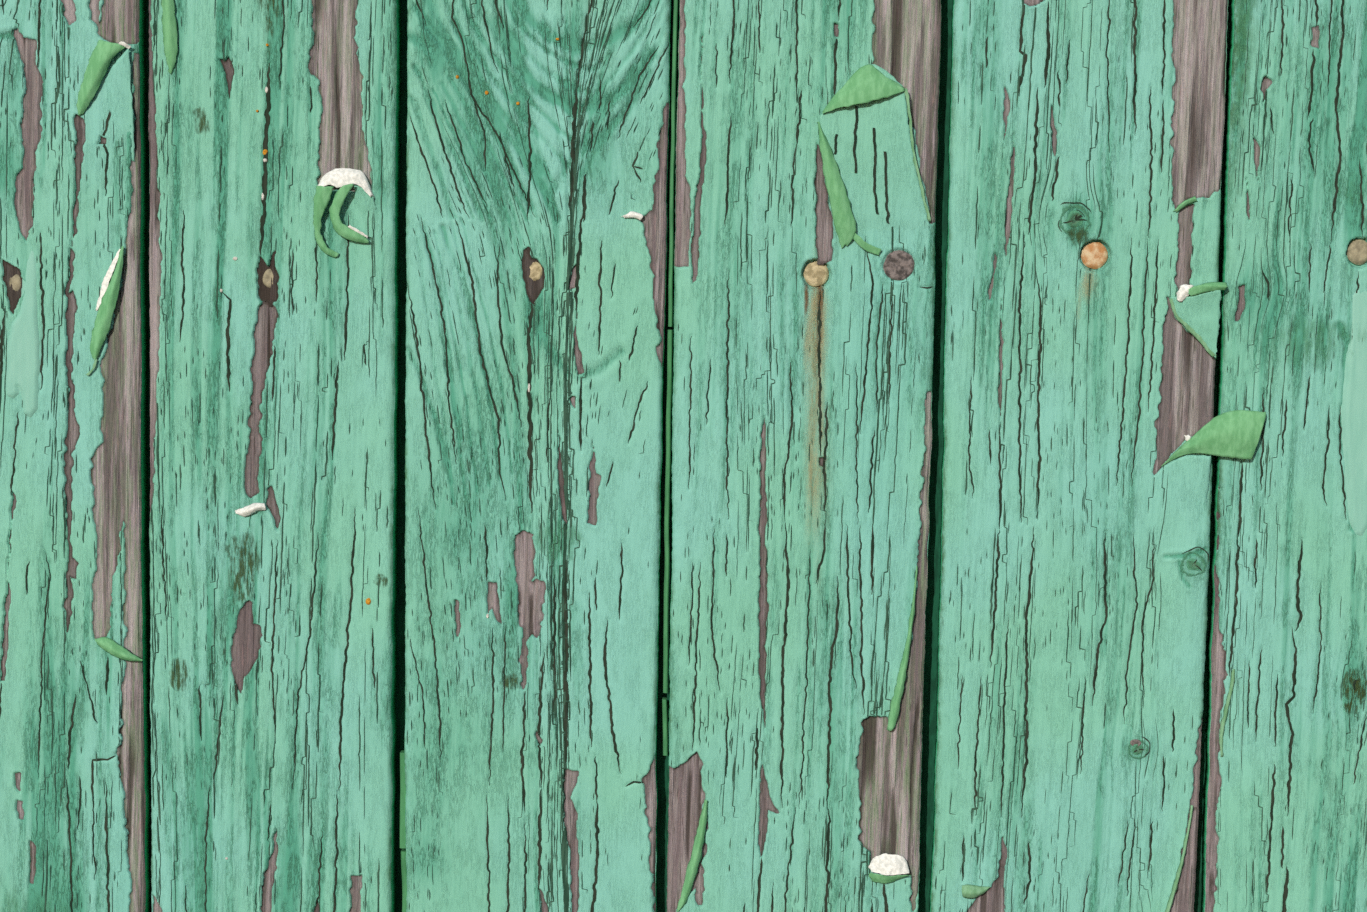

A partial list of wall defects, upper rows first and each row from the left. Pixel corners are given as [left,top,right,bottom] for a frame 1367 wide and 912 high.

peeling [14,29,44,241]
peeling [308,0,377,258]
peeling [814,0,941,265]
peeling [61,0,178,912]
peeling [235,250,281,528]
crack [0,0,669,912]
crack [671,0,1367,912]
peeling [1153,0,1266,912]
peeling [487,530,546,690]
peeling [857,391,932,912]
peeling [642,752,709,912]
peeling [962,837,1007,912]